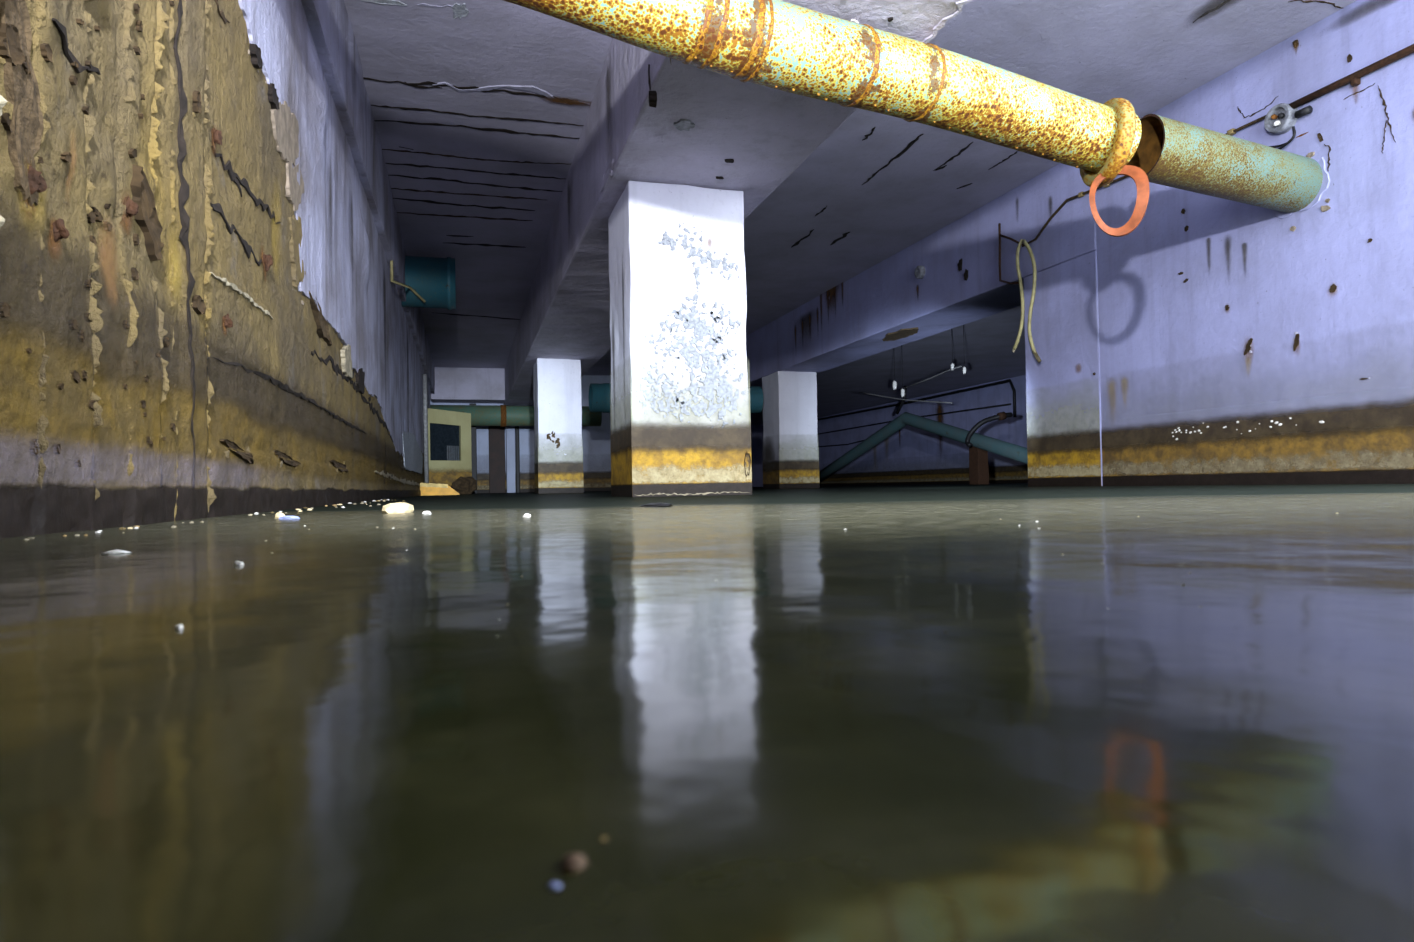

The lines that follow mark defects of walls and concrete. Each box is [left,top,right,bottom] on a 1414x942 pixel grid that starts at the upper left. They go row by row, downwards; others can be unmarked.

rust [546,97,591,105]
spalling [922,0,973,43]
spalling [0,0,424,521]
damp [0,240,970,539]
peeling [634,223,745,428]
damp [989,399,1414,487]